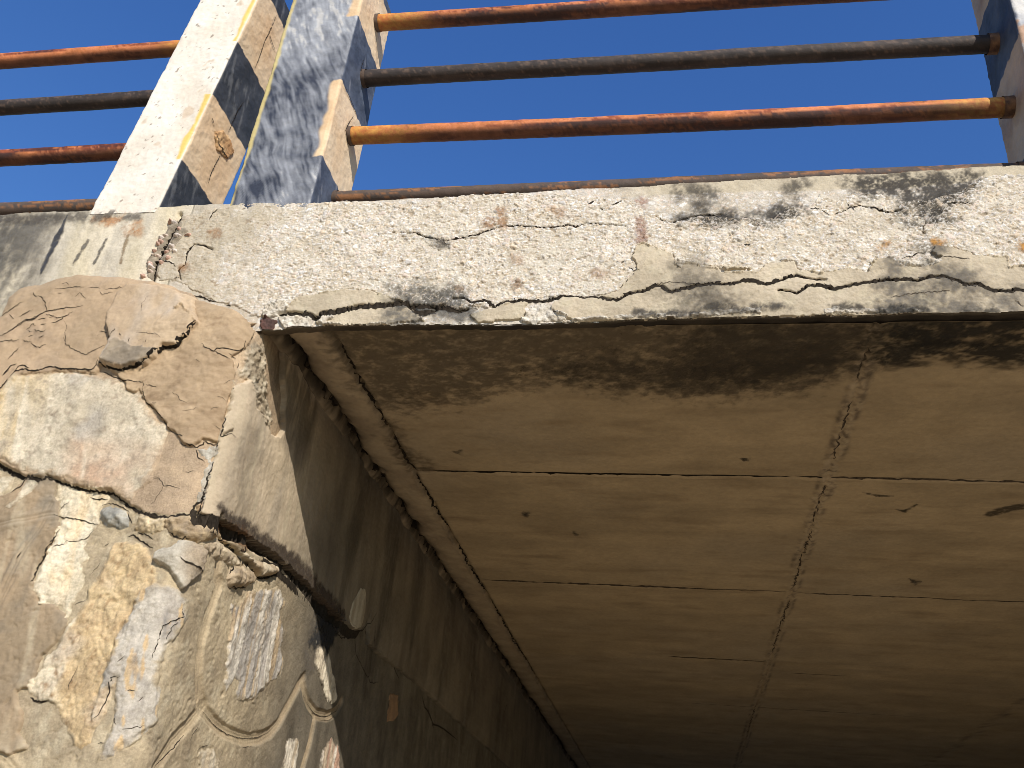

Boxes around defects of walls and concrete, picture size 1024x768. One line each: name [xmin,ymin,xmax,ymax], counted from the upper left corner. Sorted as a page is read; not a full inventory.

spalling [214,130,234,159]
crack [403,200,622,245]
crack [280,221,1024,321]
crack [811,204,898,214]
crack [0,215,399,684]
spalling [0,174,1024,763]